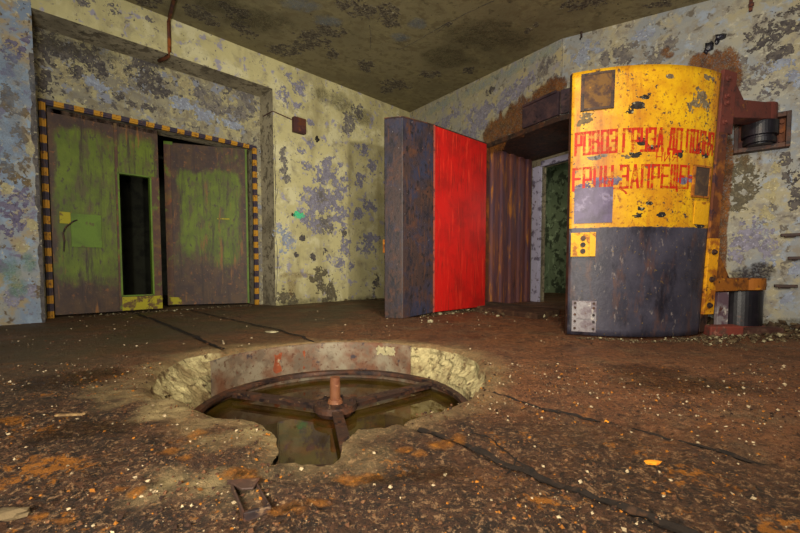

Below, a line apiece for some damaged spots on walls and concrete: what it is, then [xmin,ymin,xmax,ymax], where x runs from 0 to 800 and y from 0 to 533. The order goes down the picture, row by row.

peeling [277,72,308,109]
peeling [341,104,363,136]
rust [483,77,567,154]
rust [688,46,743,86]
peeling [734,4,800,102]
spalling [0,26,260,322]
peeling [272,136,383,302]
flaking render [723,151,800,269]
spalling [150,352,239,409]
peeling [376,345,395,356]
spalling [411,347,486,401]
crack [469,430,553,486]